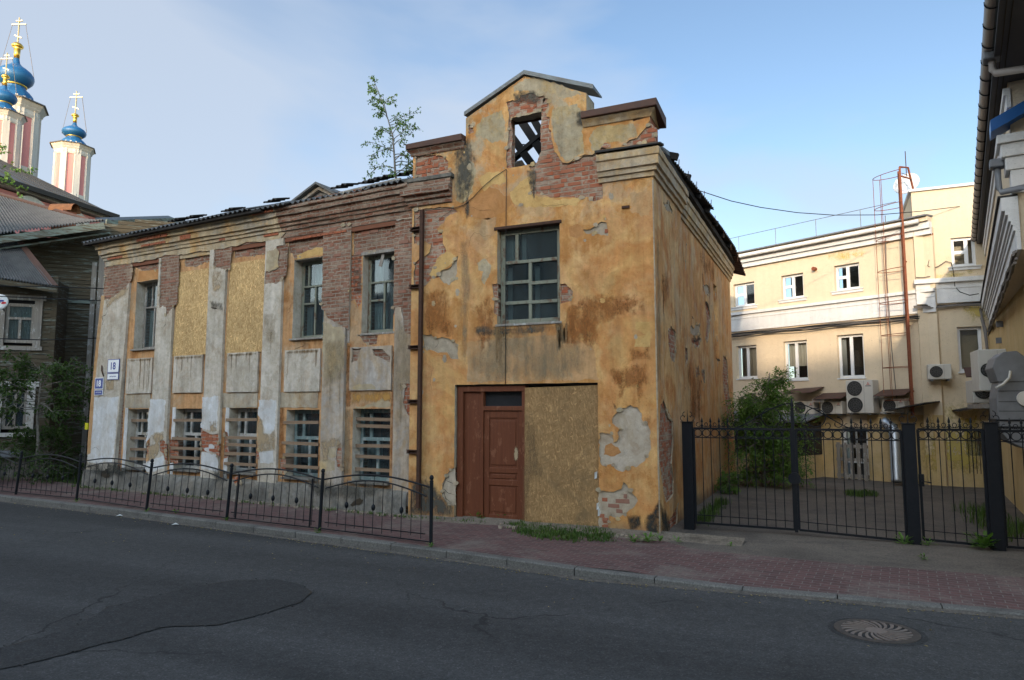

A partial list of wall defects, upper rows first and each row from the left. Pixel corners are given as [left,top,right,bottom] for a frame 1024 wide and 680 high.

flaking render [87,77,658,474]
flaking render [440,468,458,506]
flaking render [596,402,672,527]